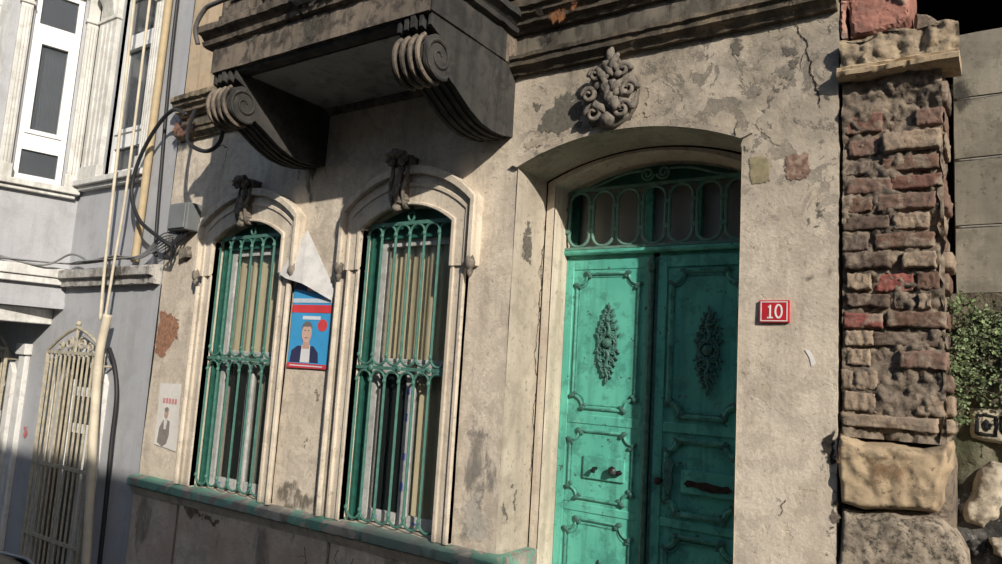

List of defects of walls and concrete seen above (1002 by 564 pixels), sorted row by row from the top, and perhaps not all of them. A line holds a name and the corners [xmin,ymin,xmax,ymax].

rust [549,0,577,24]
crack [791,0,825,106]
flaking render [533,91,585,137]
spalling [154,310,179,358]
spalling [184,506,223,527]